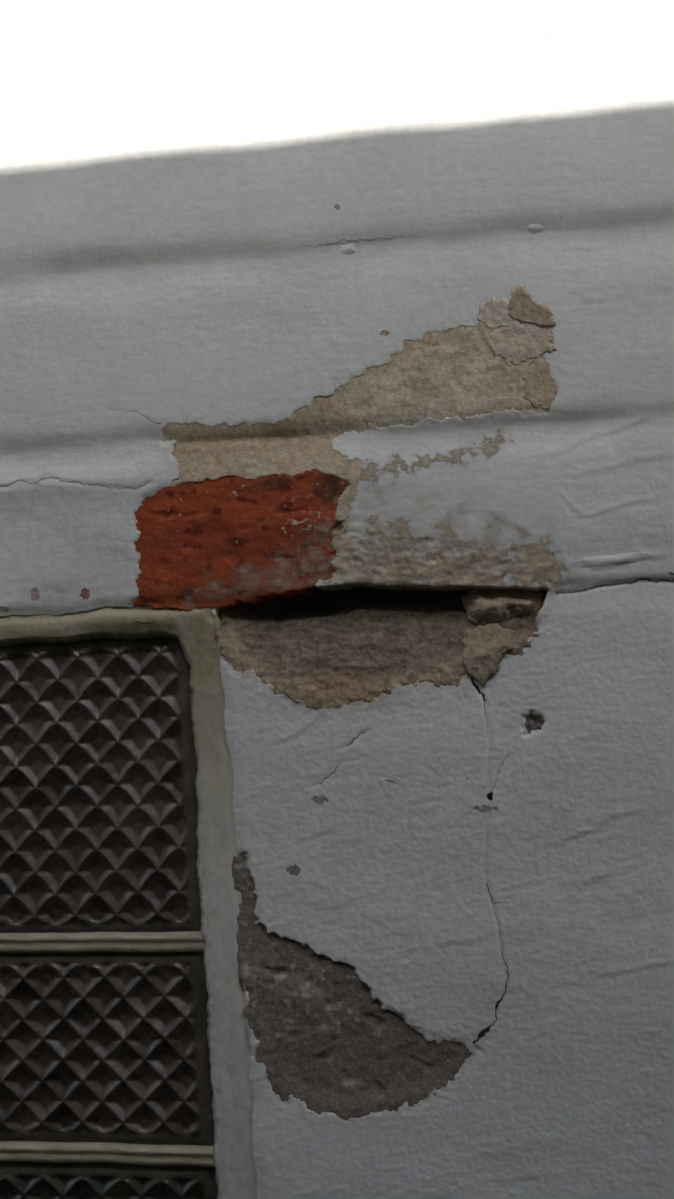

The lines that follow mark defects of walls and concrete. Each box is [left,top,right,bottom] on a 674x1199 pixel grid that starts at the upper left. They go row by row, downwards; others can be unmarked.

peeling [134,285,566,710]
spalling [232,854,471,1121]
crack [471,677,511,1044]
peeling [525,714,545,734]